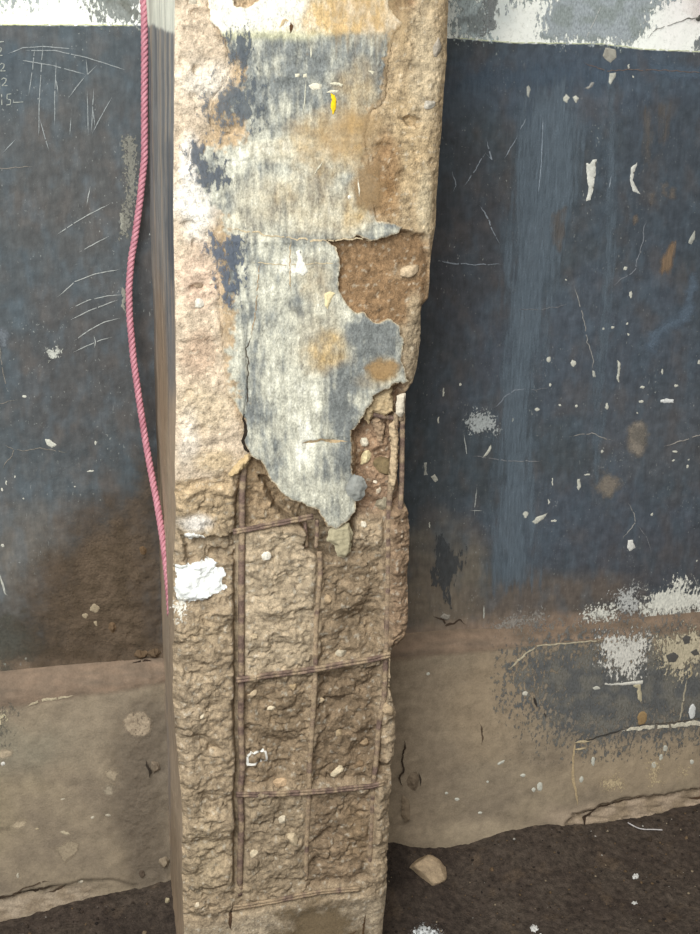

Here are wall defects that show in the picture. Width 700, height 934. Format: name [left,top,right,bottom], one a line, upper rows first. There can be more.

peeling [77,0,141,32]
crack [649,15,700,37]
spalling [172,0,700,921]
damp [577,575,700,625]
crack [0,881,67,899]
damp [275,899,362,934]